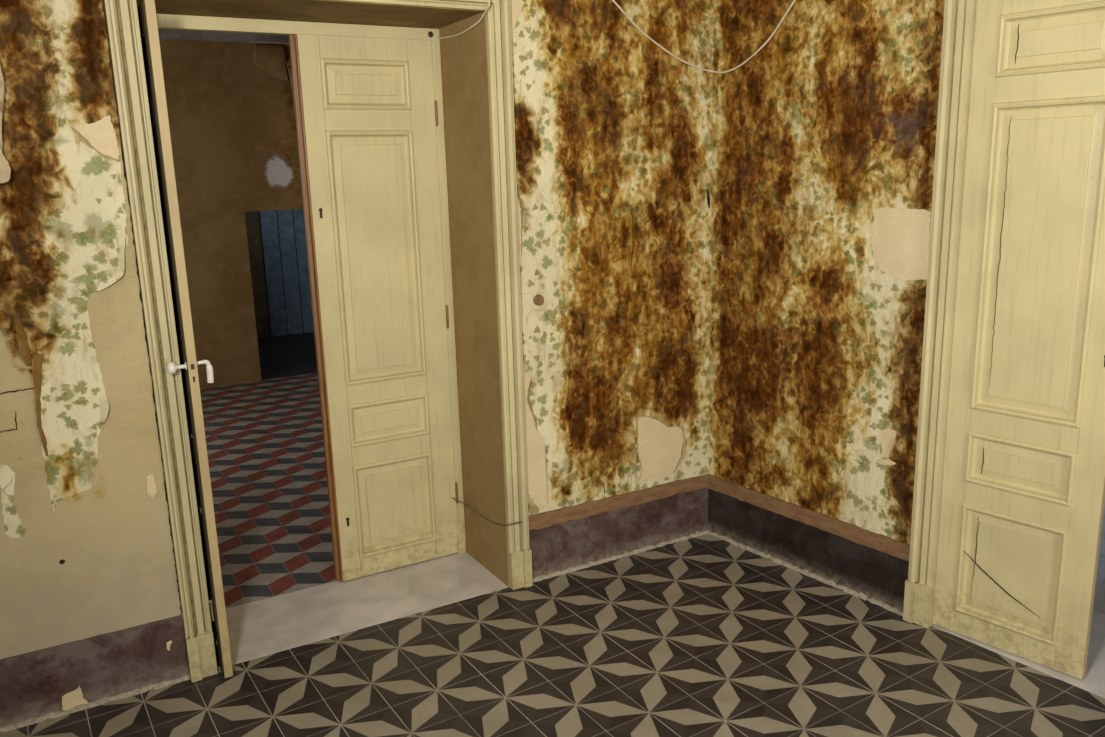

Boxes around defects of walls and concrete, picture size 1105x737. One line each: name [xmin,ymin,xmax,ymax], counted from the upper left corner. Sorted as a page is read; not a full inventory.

water stain [66,0,120,128]
water stain [0,0,69,357]
peeling [71,115,119,160]
water stain [514,103,541,194]
water stain [538,0,944,544]
peeling [871,207,931,281]
flaking render [146,473,157,498]
peeling [637,416,686,485]